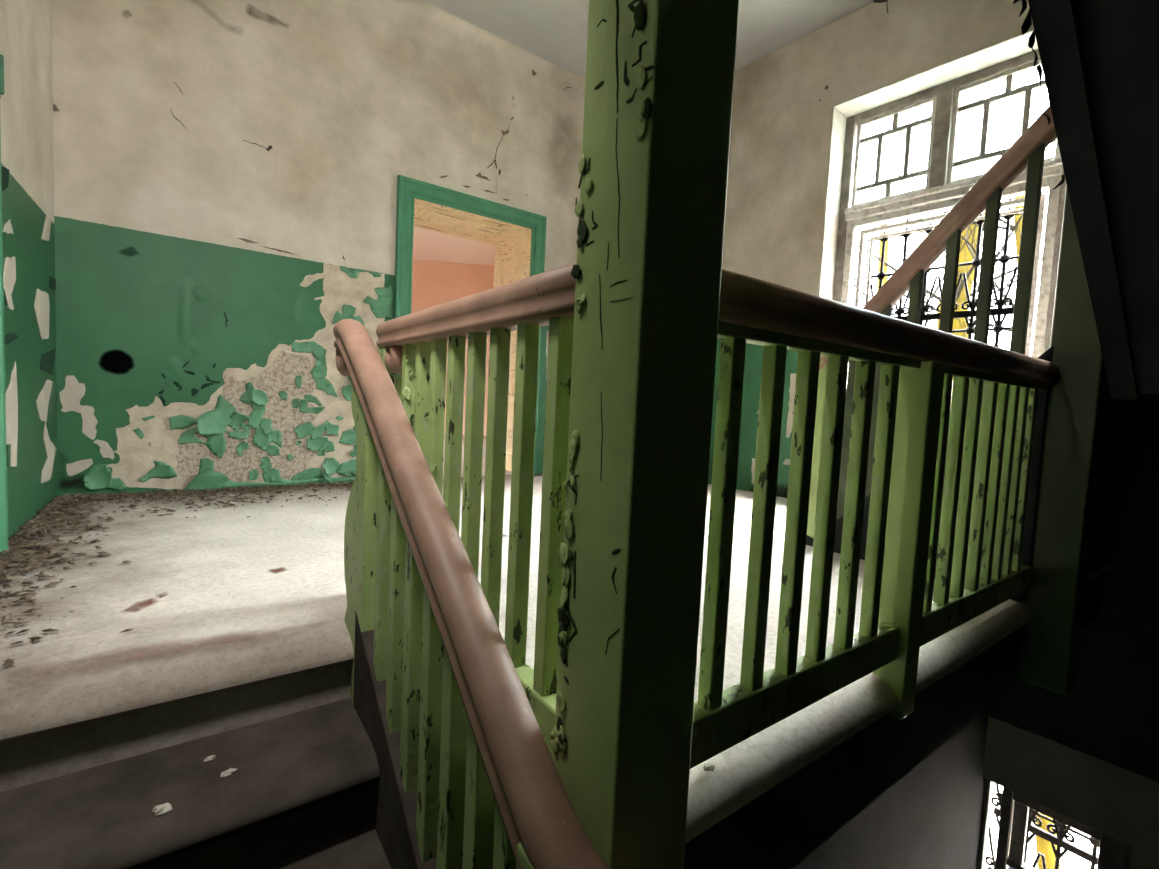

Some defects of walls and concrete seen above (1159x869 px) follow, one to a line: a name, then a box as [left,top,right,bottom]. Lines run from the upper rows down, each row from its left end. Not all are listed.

peeling [634,0,646,31]
crack [475,96,514,186]
peeling [1,167,9,192]
peeling [41,216,51,241]
peeling [574,201,588,248]
peeling [3,257,16,310]
peeling [571,265,580,279]
peeling [4,332,18,344]
peeling [34,255,393,490]
peeling [5,361,18,467]